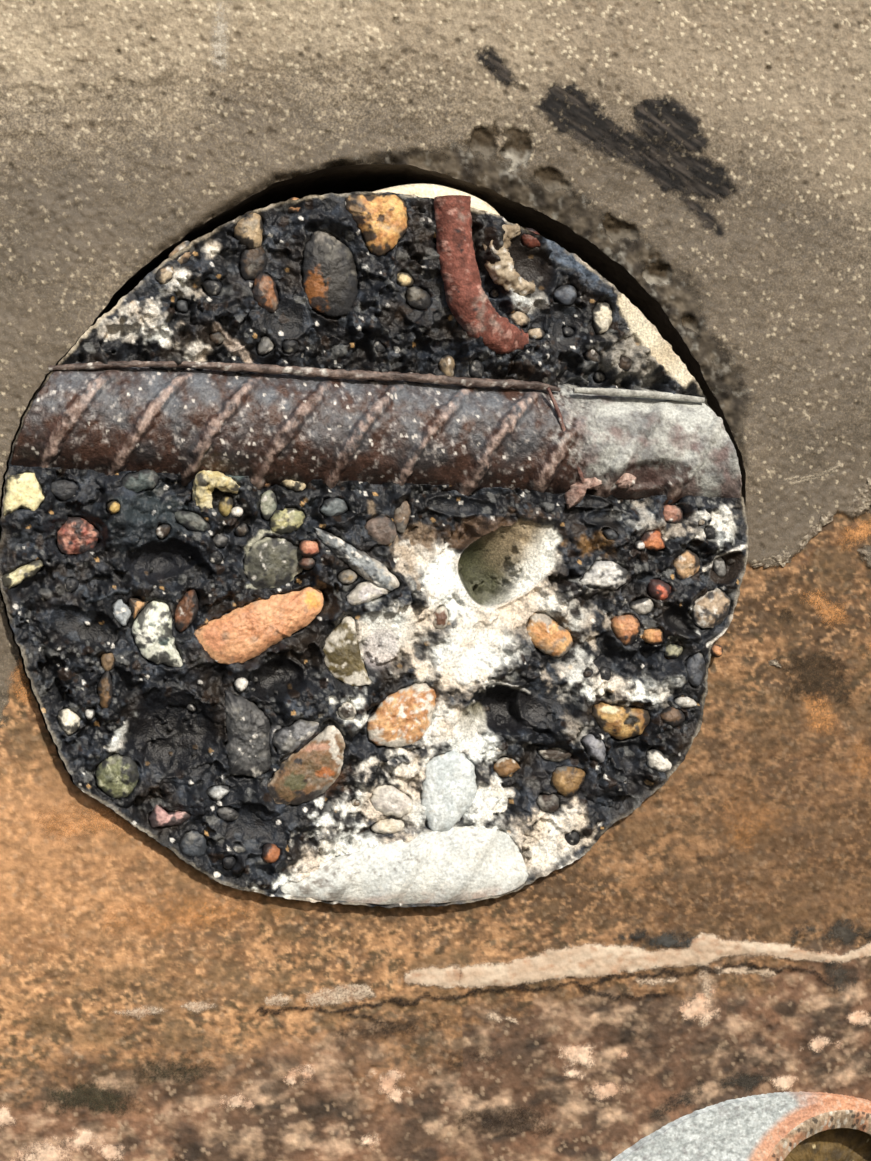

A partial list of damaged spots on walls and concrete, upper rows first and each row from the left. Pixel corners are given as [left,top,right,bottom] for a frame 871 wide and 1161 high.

water stain [0,4,871,568]
spalling [312,121,749,463]
rust [564,464,637,509]
peeling [751,477,871,569]
water stain [0,595,20,727]
water stain [776,650,851,701]
rust [0,511,871,1161]